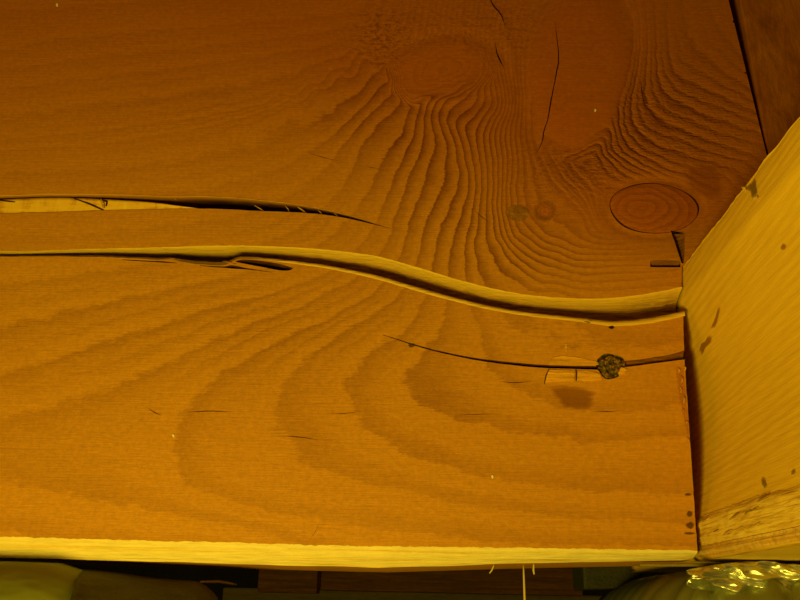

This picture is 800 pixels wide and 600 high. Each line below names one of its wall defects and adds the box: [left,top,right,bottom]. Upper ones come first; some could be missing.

crack [538,24,559,150]
crack [0,193,391,229]
crack [0,245,685,326]
crack [384,335,601,383]
crack [620,351,684,368]
leakage [556,389,589,406]